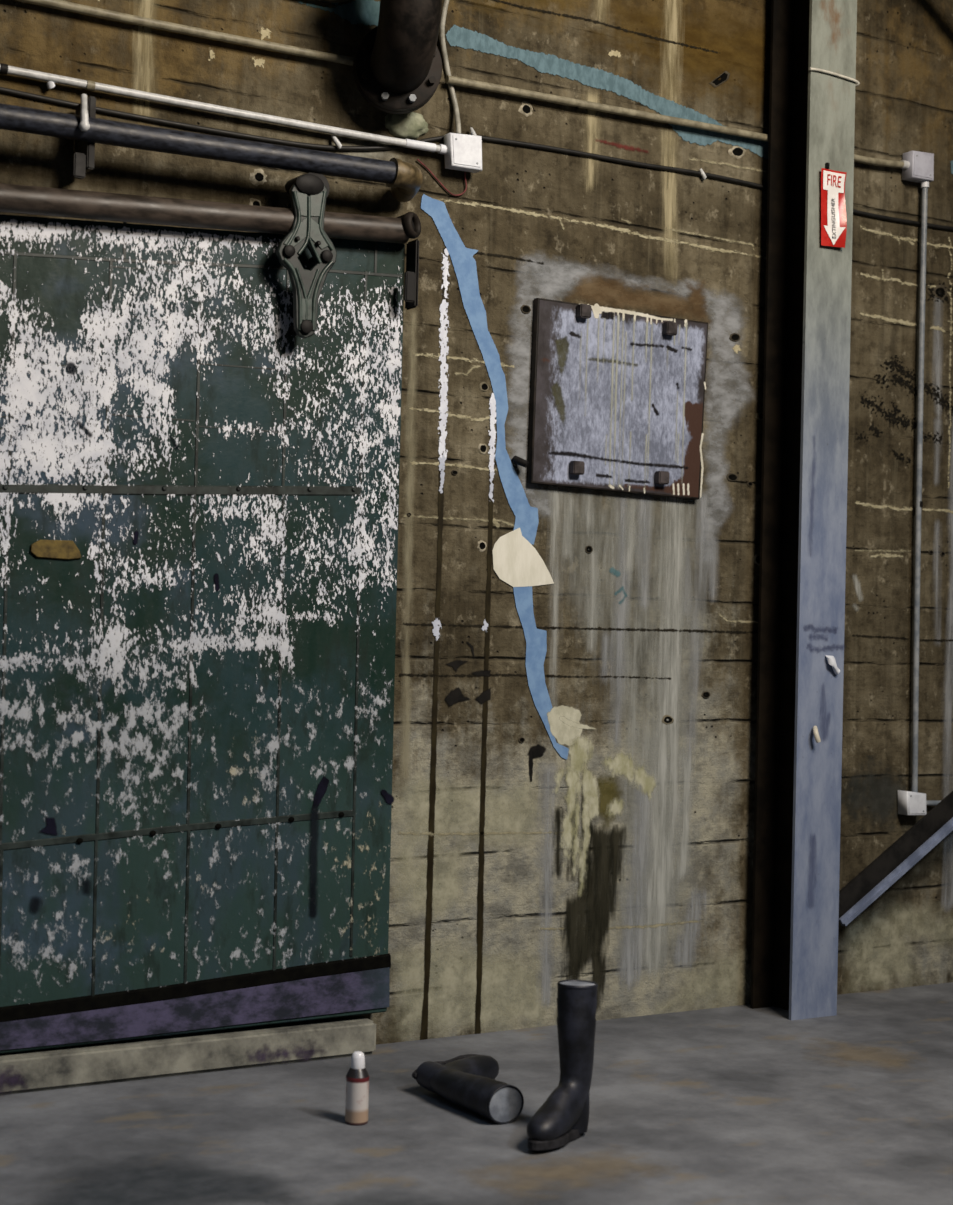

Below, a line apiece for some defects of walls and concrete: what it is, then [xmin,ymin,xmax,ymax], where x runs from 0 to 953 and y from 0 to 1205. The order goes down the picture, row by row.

rust [573,277,708,321]
leakage [585,315,652,464]
peeling [0,219,403,893]
leakage [544,497,704,1009]
peeling [2,890,118,984]
peeling [230,910,292,968]